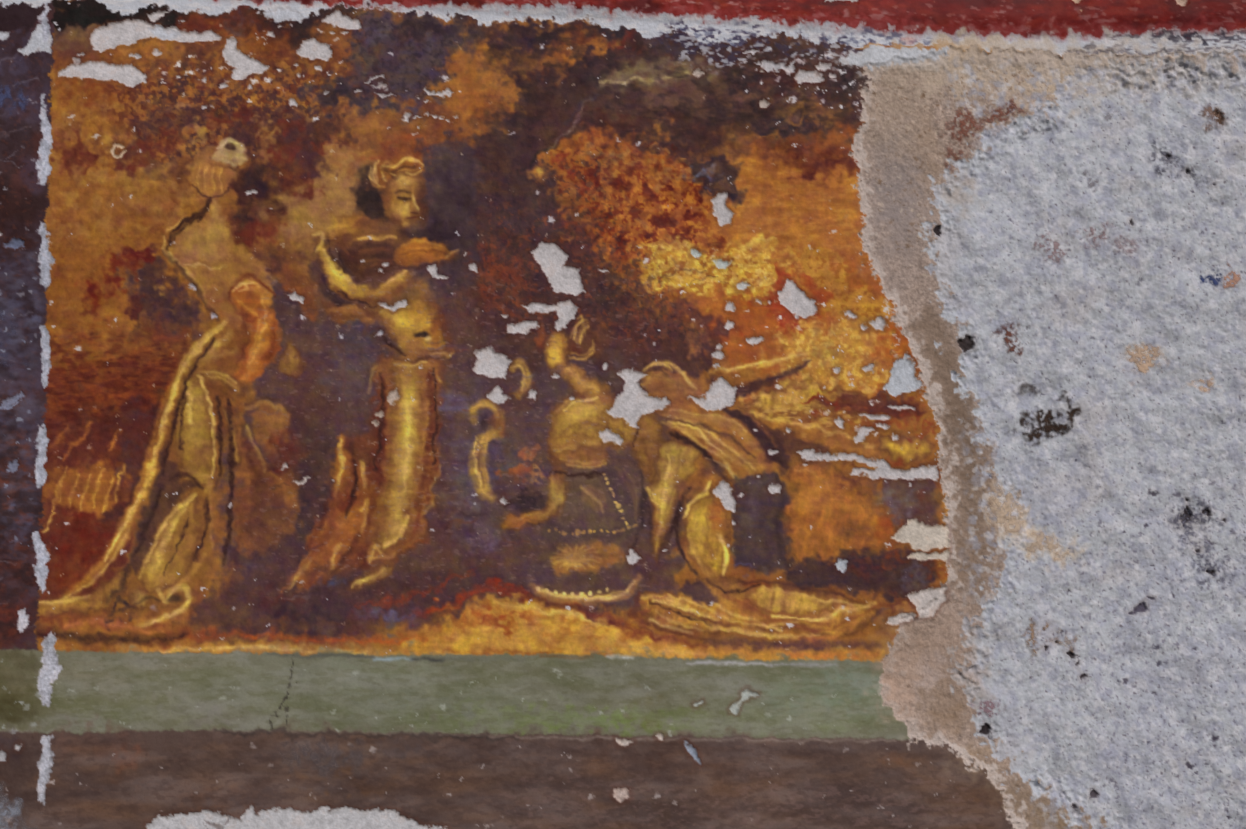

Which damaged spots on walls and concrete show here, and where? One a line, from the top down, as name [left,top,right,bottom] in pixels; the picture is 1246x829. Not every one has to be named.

peeling [0,0,79,56]
peeling [56,51,148,88]
peeling [220,36,270,81]
peeling [87,0,1246,58]
peeling [34,91,55,186]
peeling [500,240,610,335]
peeling [471,344,538,406]
peeling [596,277,819,448]
flaking render [796,43,1246,829]
peeling [30,529,51,594]
peeling [34,732,56,806]
peeling [144,804,449,829]